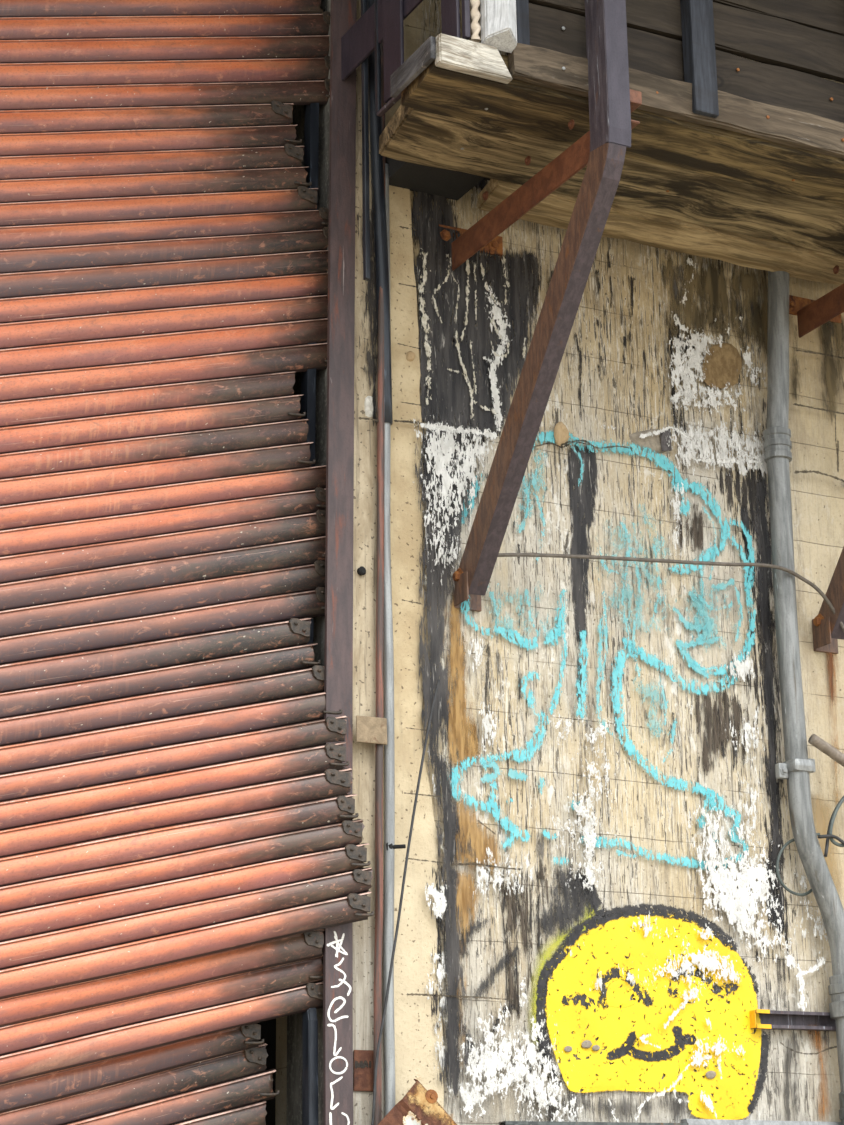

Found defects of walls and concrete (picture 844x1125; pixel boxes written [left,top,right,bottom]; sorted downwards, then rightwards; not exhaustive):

peeling [702,343,742,388]
spalling [564,1040,600,1052]
rust [378,1079,457,1125]